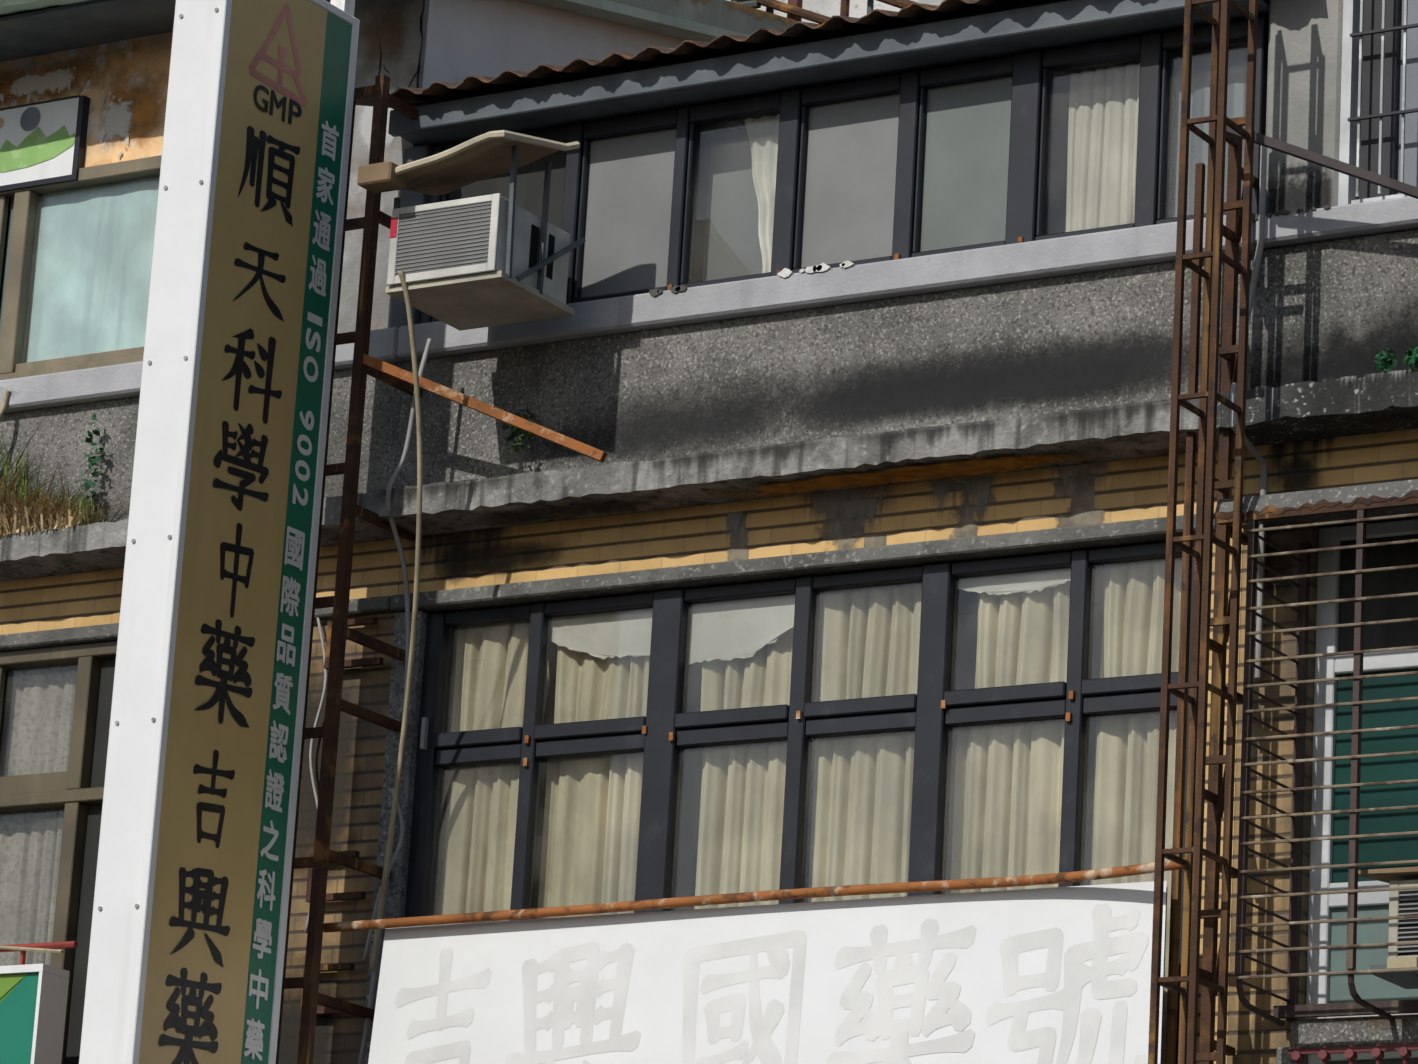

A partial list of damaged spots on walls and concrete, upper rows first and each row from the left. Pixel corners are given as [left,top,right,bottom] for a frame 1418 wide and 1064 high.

peeling [0,66,157,159]
leakage [1267,169,1331,215]
leakage [1247,305,1418,390]
leakage [552,338,1189,465]
leakage [757,455,1069,495]
leakage [1271,438,1332,492]
leakage [421,502,648,580]
leakage [1264,548,1290,594]